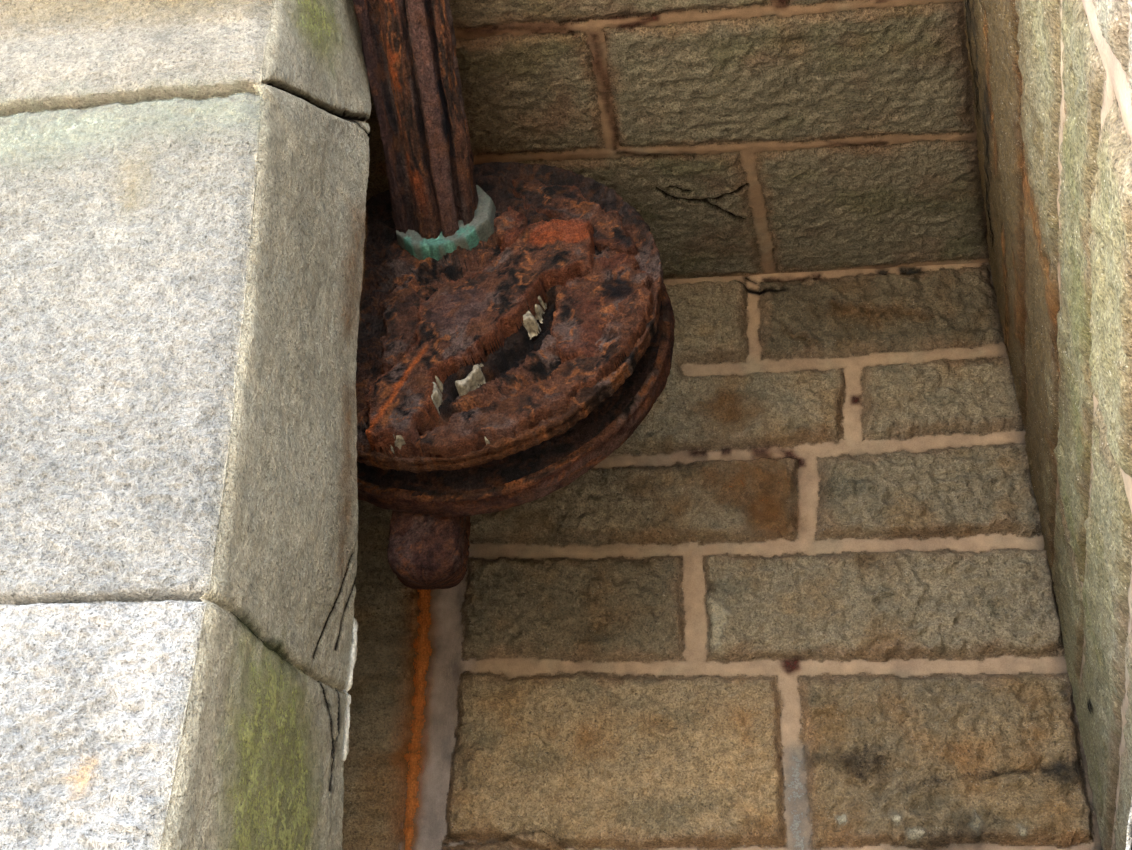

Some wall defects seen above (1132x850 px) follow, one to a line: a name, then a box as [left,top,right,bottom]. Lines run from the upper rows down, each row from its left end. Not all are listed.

crack [656,183,748,220]
crack [313,553,355,791]
rust [401,589,433,850]